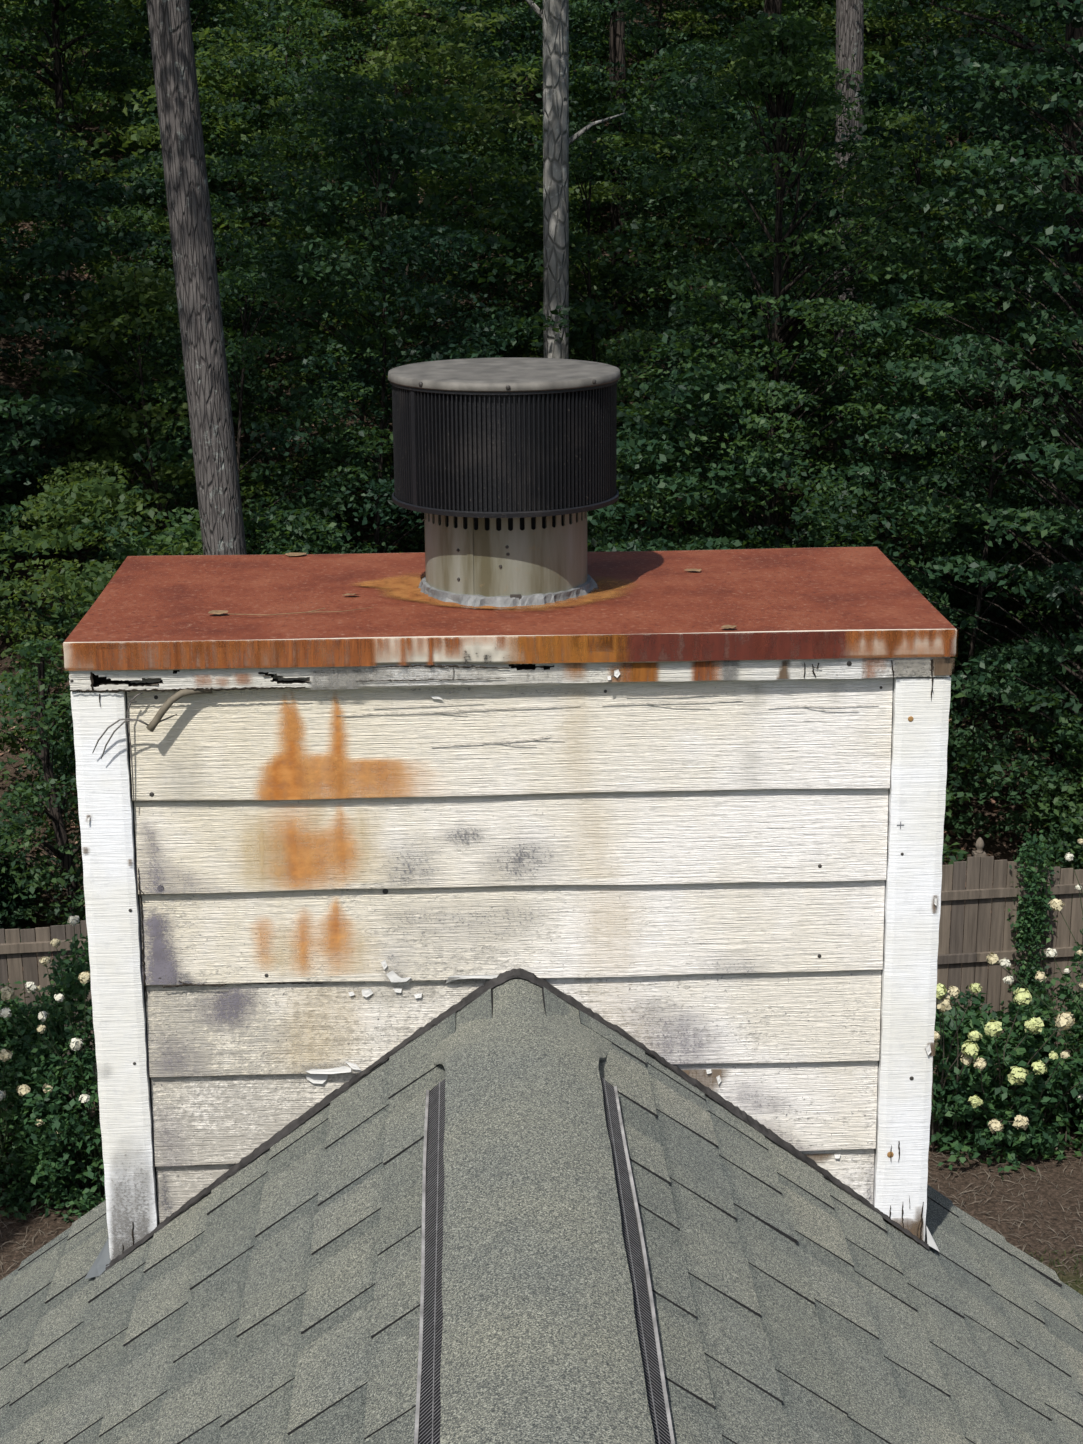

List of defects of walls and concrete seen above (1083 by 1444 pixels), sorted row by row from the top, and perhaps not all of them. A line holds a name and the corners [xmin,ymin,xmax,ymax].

corrosion [358,576,625,609]
corrosion [70,637,462,682]
corrosion [497,629,955,682]
crack [70,672,306,707]
corrosion [259,700,396,888]
corrosion [297,904,348,966]